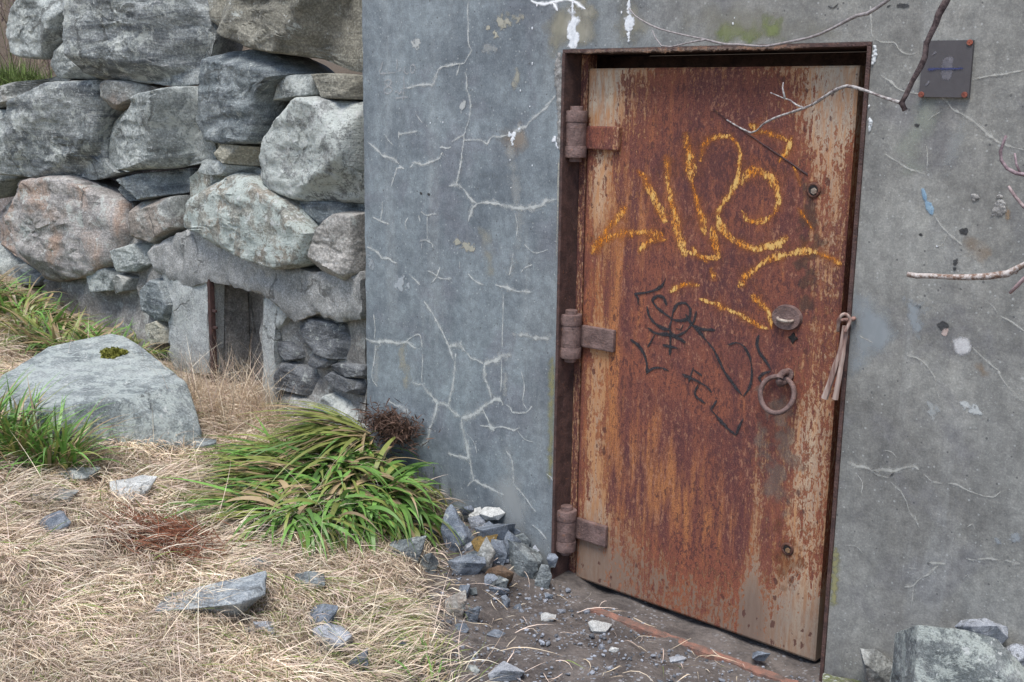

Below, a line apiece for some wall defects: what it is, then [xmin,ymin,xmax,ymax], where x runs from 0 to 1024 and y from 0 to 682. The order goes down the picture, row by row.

crack [531,0,585,11]
damp [550,0,597,49]
damp [622,0,644,42]
crack [368,5,556,538]